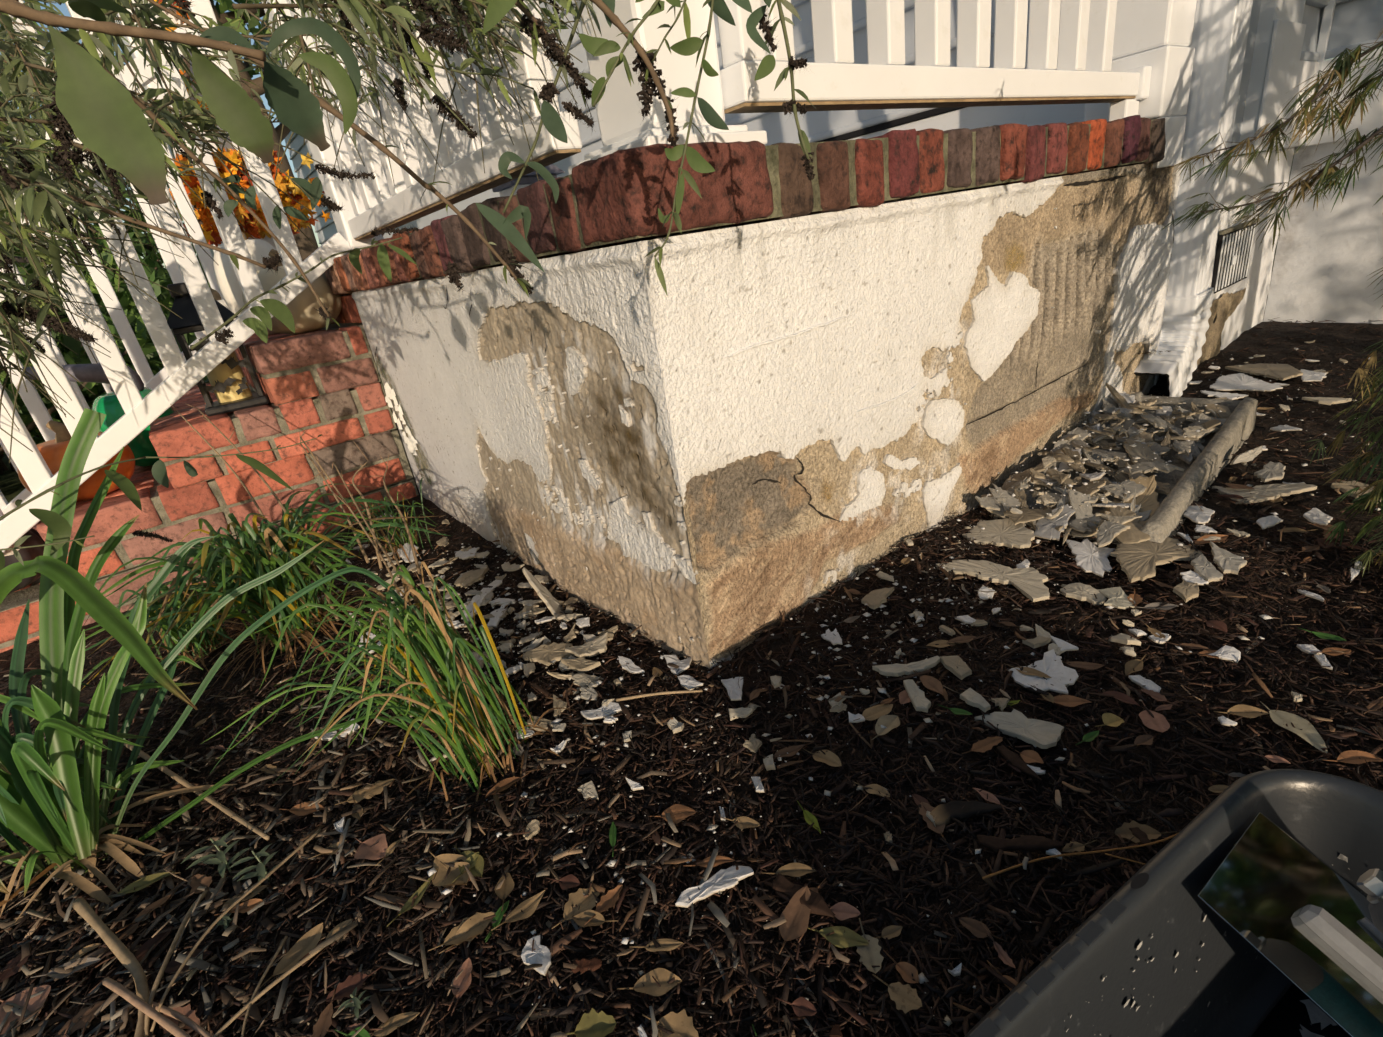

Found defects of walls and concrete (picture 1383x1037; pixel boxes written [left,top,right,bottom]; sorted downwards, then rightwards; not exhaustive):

crack [752,457,841,522]
peeling [477,163,1174,701]